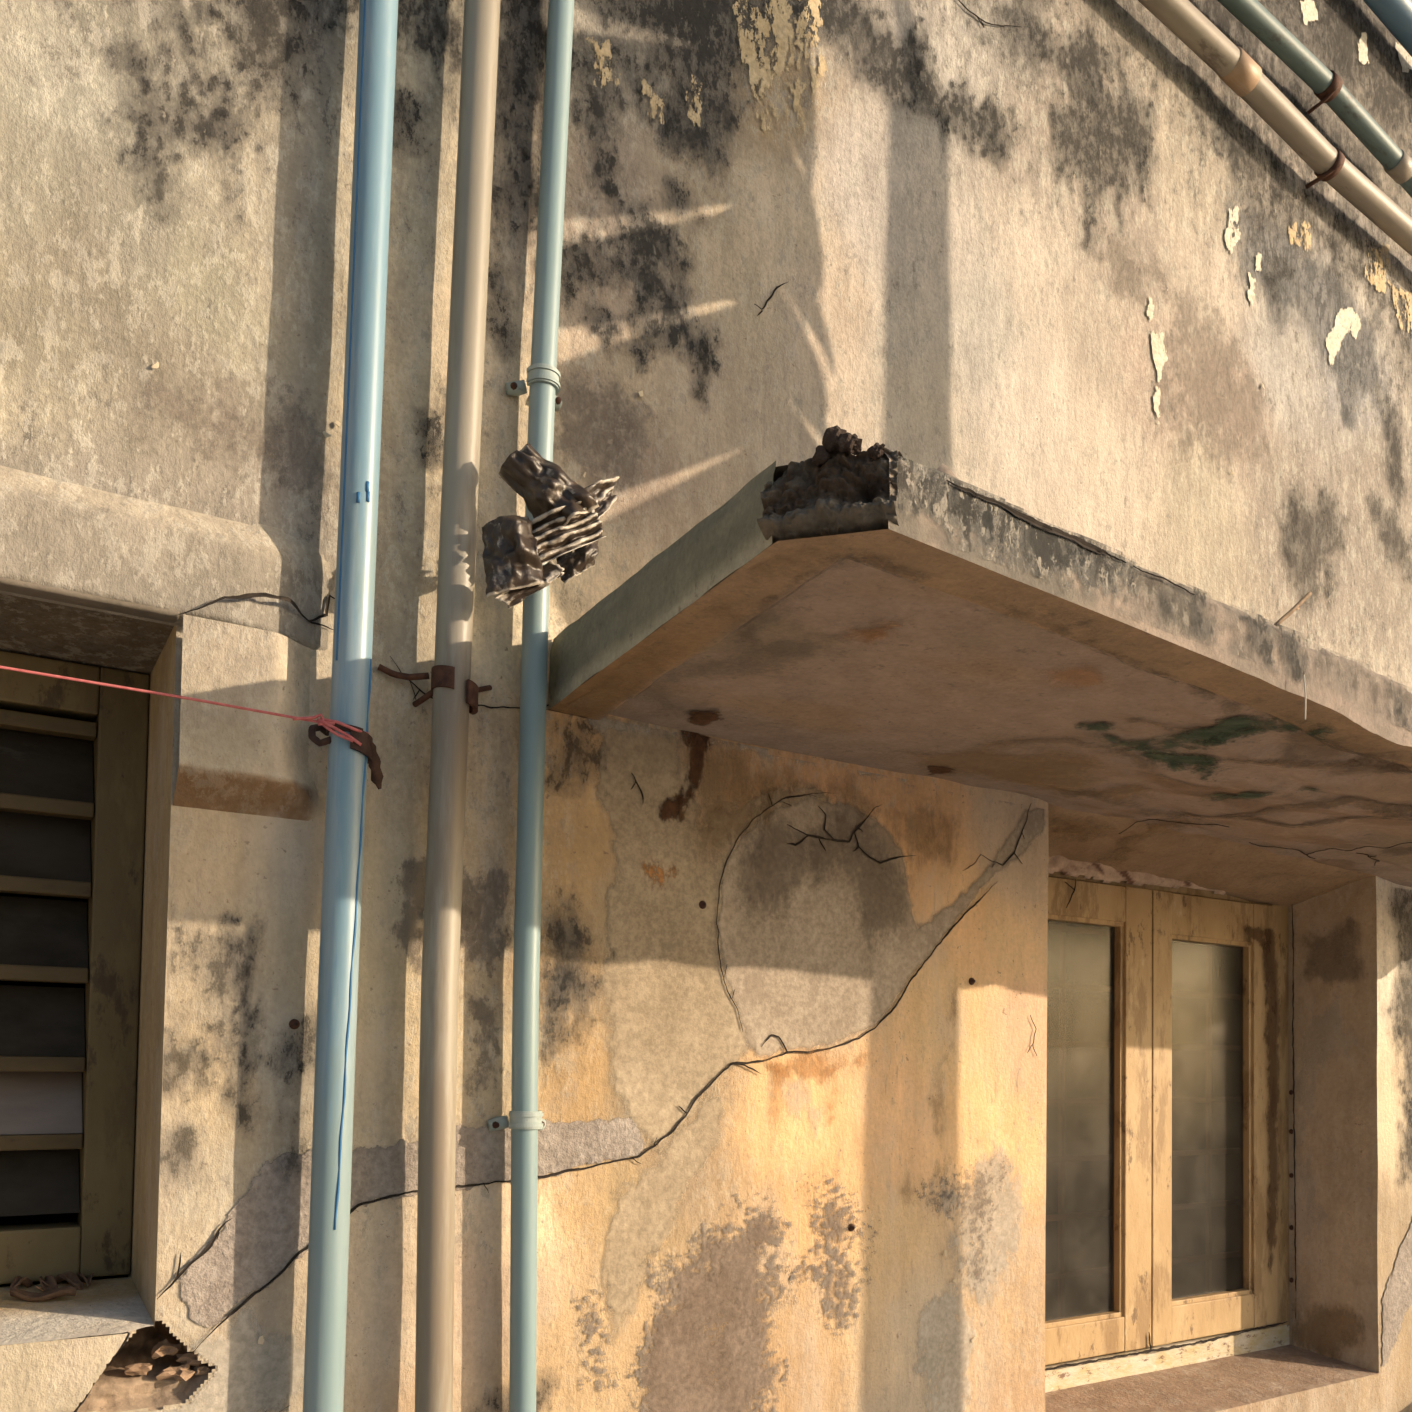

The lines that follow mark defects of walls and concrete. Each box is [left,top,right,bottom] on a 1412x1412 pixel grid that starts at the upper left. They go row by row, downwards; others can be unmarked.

leakage [111,0,360,221]
peeling [732,0,827,136]
leakage [1013,8,1155,249]
leakage [1208,107,1412,580]
peeling [1326,306,1361,365]
spalling [757,425,904,546]
leakage [896,455,1139,595]
crack [183,593,335,630]
rust [660,711,721,822]
crack [455,792,1031,1196]
crack [157,1219,231,1299]
spalling [77,1310,305,1412]